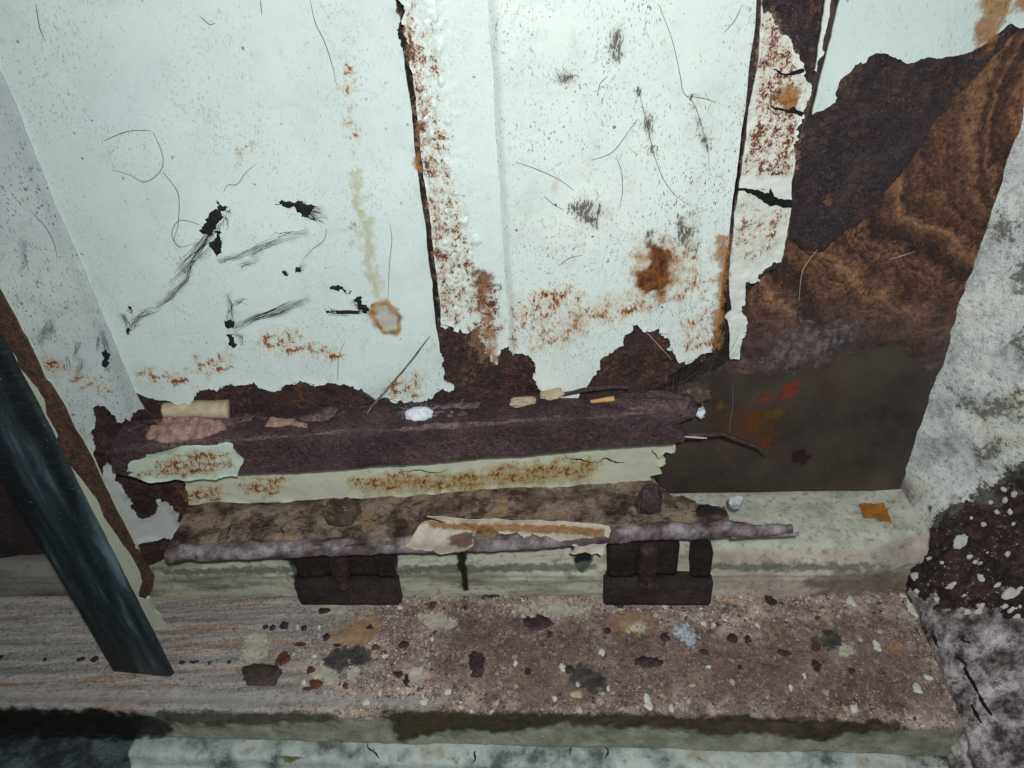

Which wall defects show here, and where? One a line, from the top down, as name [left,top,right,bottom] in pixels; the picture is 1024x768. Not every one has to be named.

rust [400,0,1024,376]
crack [737,188,792,208]
peeling [192,381,402,414]
rust [258,331,342,362]
peeling [427,315,541,401]
peeling [580,325,694,394]
damp [746,316,872,447]
peeling [91,394,171,471]
rust [352,458,598,492]